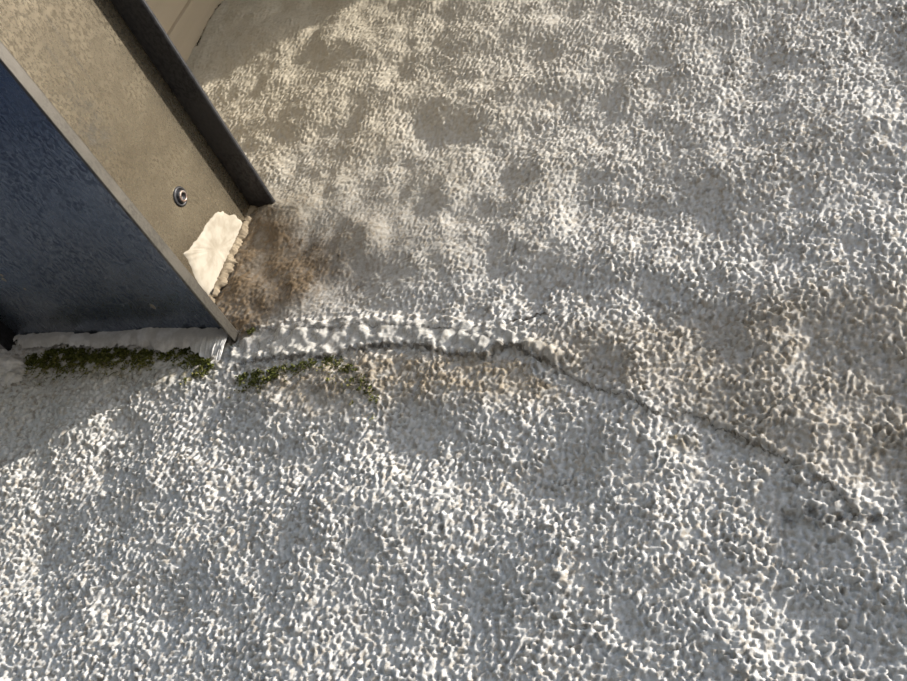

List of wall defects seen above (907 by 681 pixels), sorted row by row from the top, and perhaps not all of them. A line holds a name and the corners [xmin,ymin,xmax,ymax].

crack [554,365,792,464]